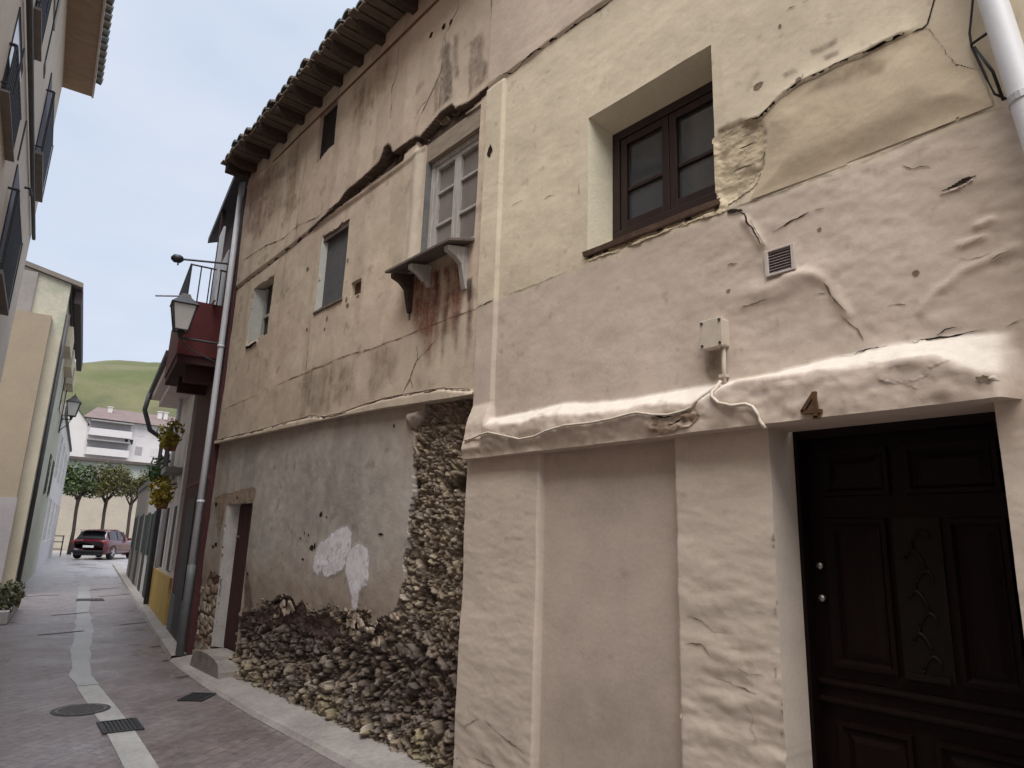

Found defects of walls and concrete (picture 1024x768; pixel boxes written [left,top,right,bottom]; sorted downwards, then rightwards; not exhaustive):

leakage [439,45,458,105]
crack [740,0,978,124]
spalling [585,117,766,263]
crack [727,108,999,247]
crack [220,271,566,440]
rust [413,266,460,335]
crack [819,282,884,352]
crack [912,327,978,343]
spalling [647,408,700,435]
flaking render [212,487,256,548]
spalling [228,398,473,768]